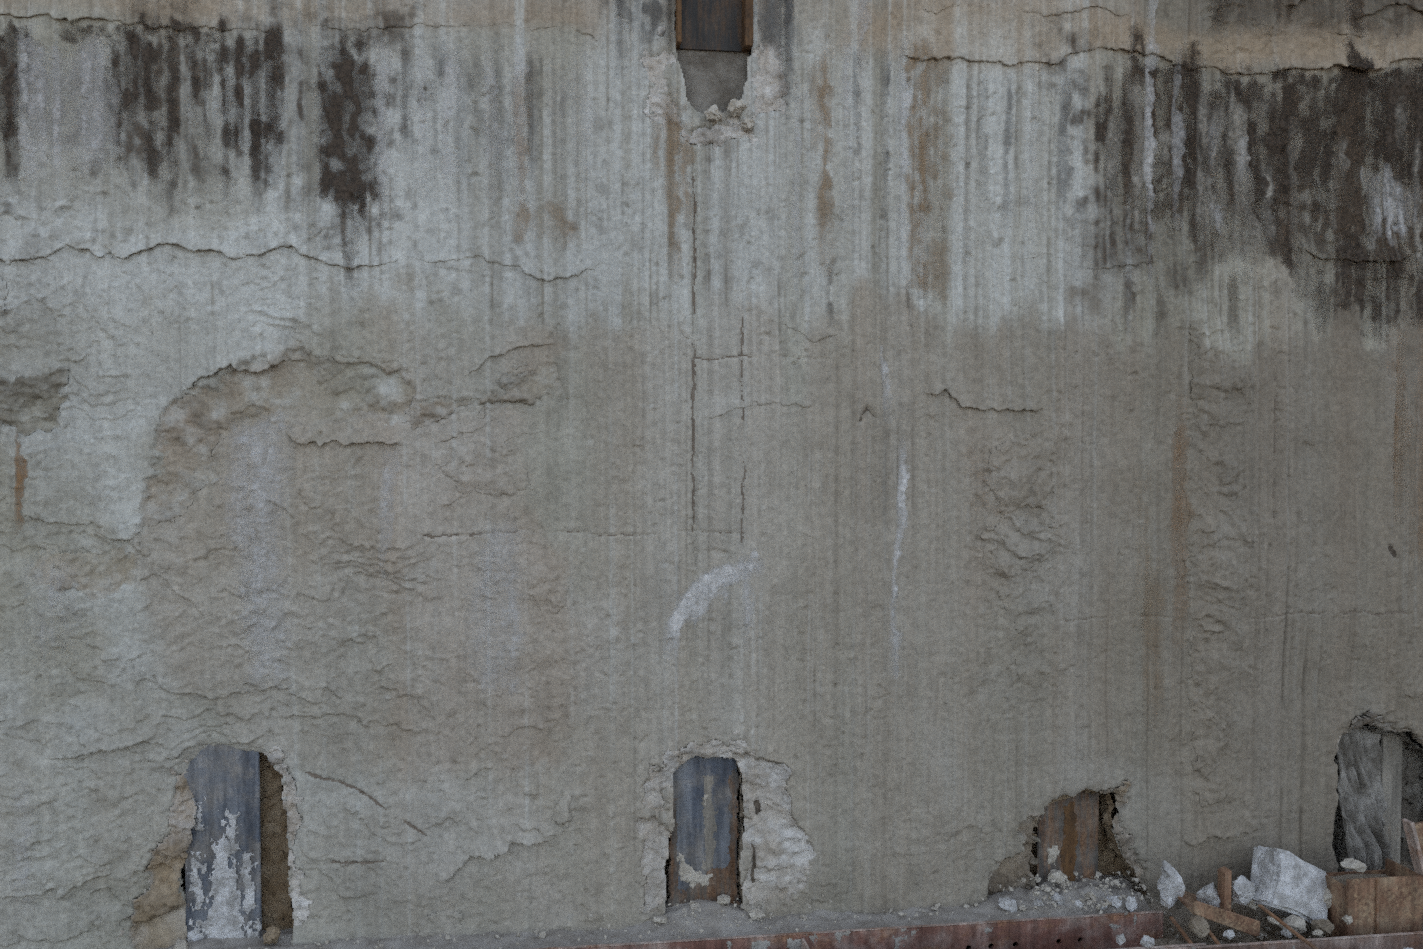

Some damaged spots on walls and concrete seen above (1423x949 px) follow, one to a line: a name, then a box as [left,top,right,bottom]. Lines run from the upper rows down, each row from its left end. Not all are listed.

leakage [0,22,61,175]
leakage [65,12,402,241]
spalling [631,25,789,150]
peeling [898,0,1423,75]
leakage [1060,33,1423,322]
peeling [33,693,320,949]
spalling [634,730,816,915]
spalling [988,810,1041,894]
spalling [1100,780,1153,882]